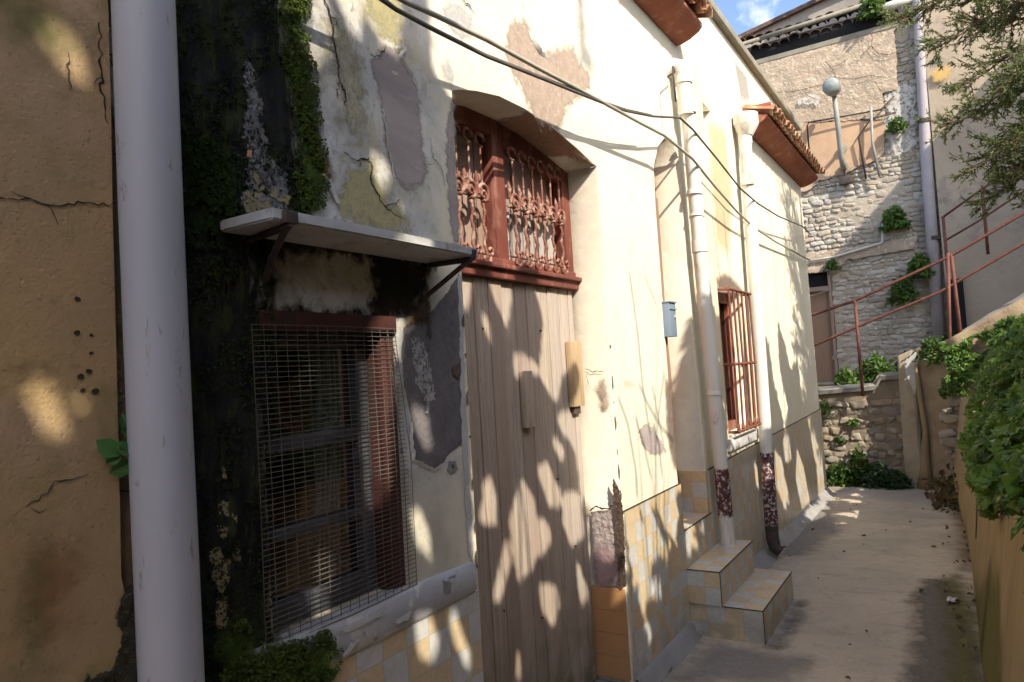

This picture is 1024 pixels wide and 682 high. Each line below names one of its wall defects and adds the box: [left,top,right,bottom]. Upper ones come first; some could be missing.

crack [66,22,116,156]
crack [324,0,347,105]
flaking render [370,41,427,190]
flaking render [505,1,590,130]
crack [0,191,118,224]
crack [344,152,401,218]
mould [175,0,437,682]
crack [26,474,87,513]
flaking render [402,274,479,569]
flaking render [590,450,627,589]
peeling [639,424,666,455]